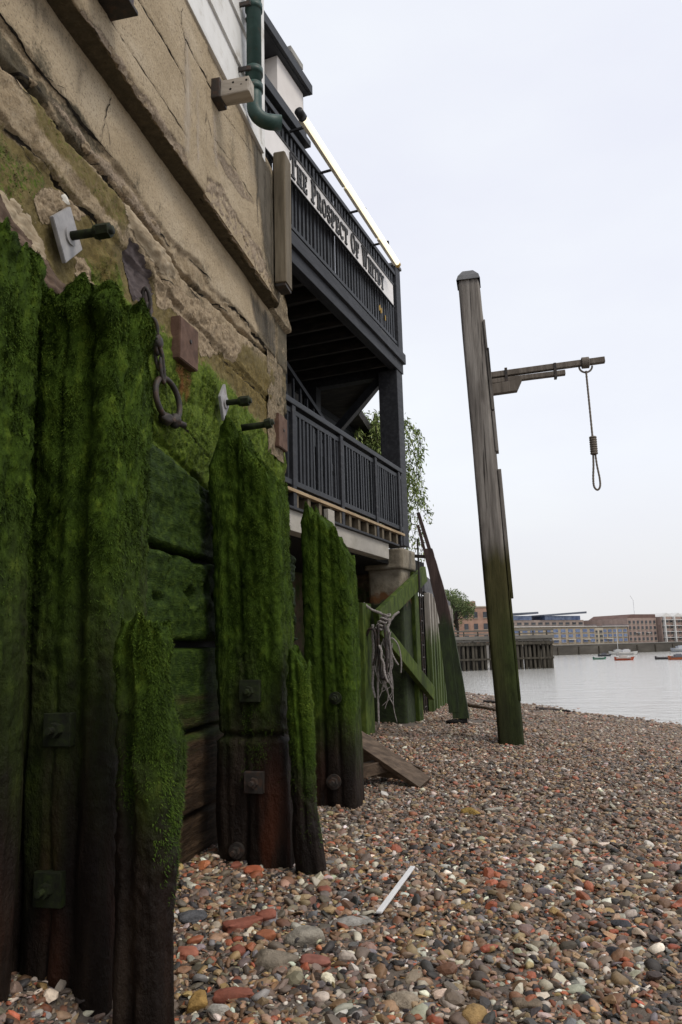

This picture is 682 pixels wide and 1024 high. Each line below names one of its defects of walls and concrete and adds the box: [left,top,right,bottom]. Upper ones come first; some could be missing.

crack [0,13,120,198]